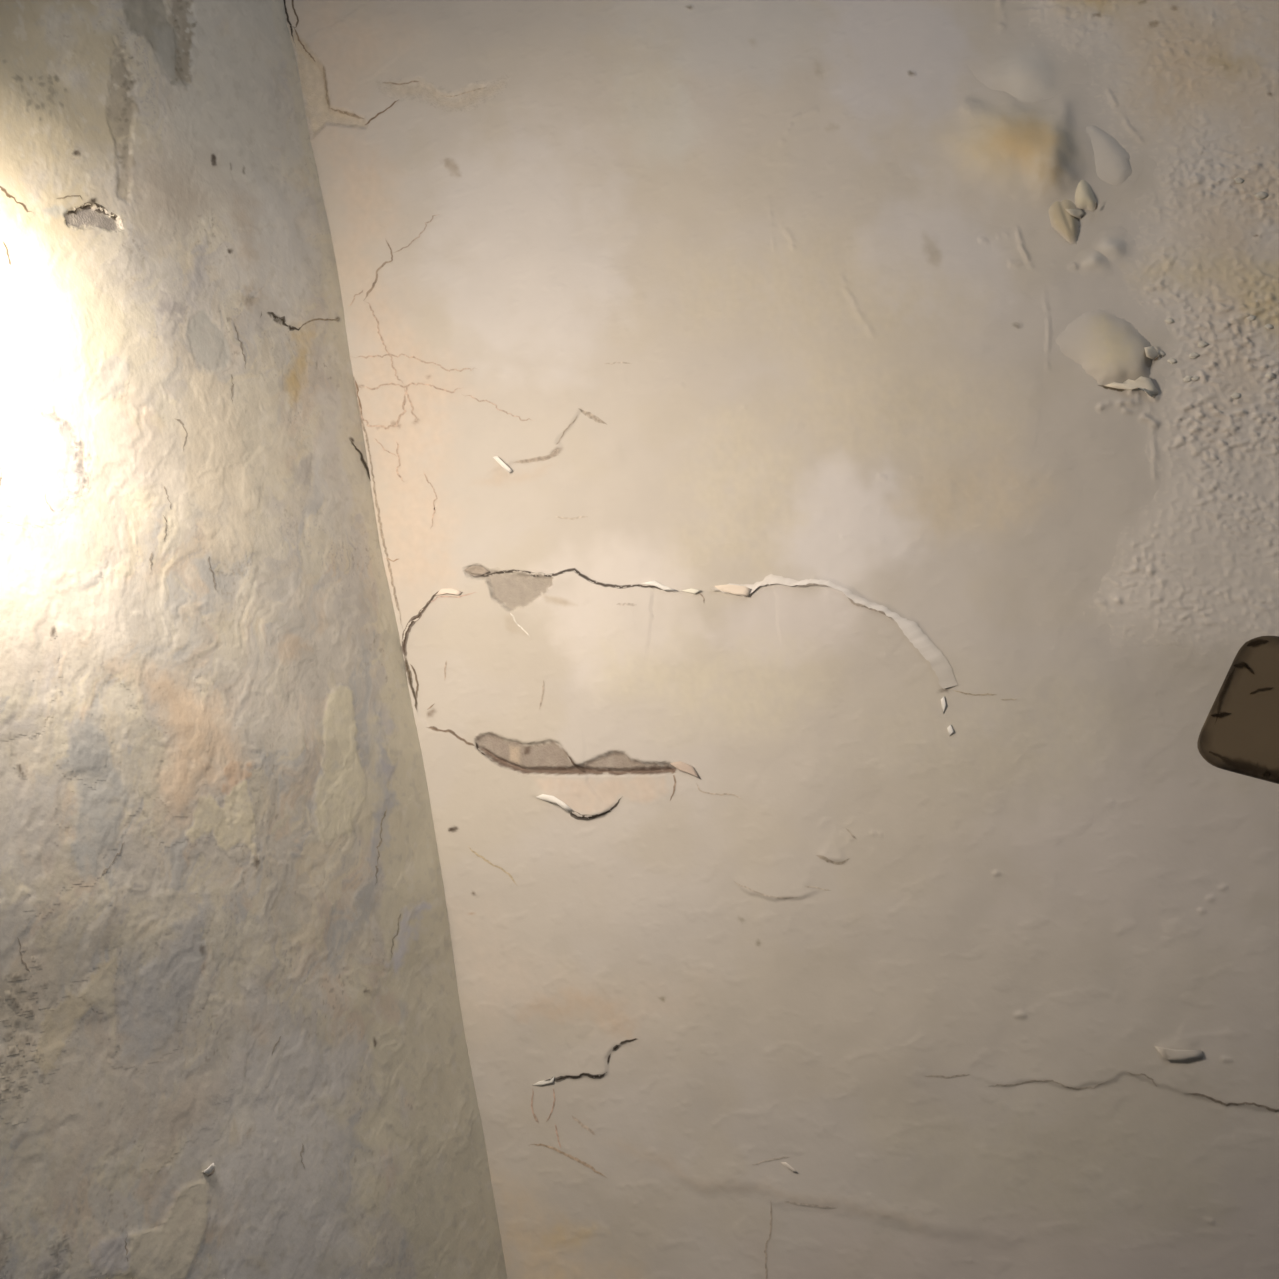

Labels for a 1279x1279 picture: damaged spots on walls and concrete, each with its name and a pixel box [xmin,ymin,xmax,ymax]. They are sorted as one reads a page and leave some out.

crack [283,0,315,62]
crack [365,100,398,125]
crack [0,186,32,212]
crack [231,214,1017,746]
spalling [462,562,579,640]
spalling [474,731,741,821]
crack [530,1038,637,1178]
crack [926,1072,1279,1112]